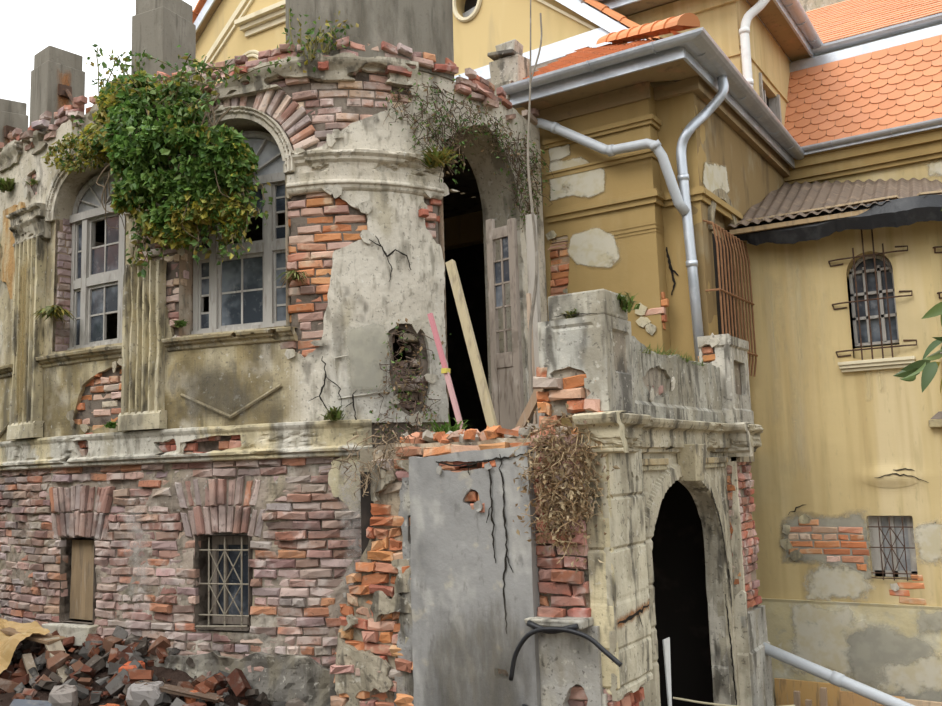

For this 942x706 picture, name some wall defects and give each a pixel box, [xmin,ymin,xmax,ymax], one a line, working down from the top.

flaking render [280,184,374,359]
crack [369,236,411,281]
flaking render [66,358,122,457]
flaking render [394,477,414,706]
crack [436,452,533,634]
flaking render [780,514,871,600]
flaking render [889,574,927,605]
peeling [914,524,942,562]